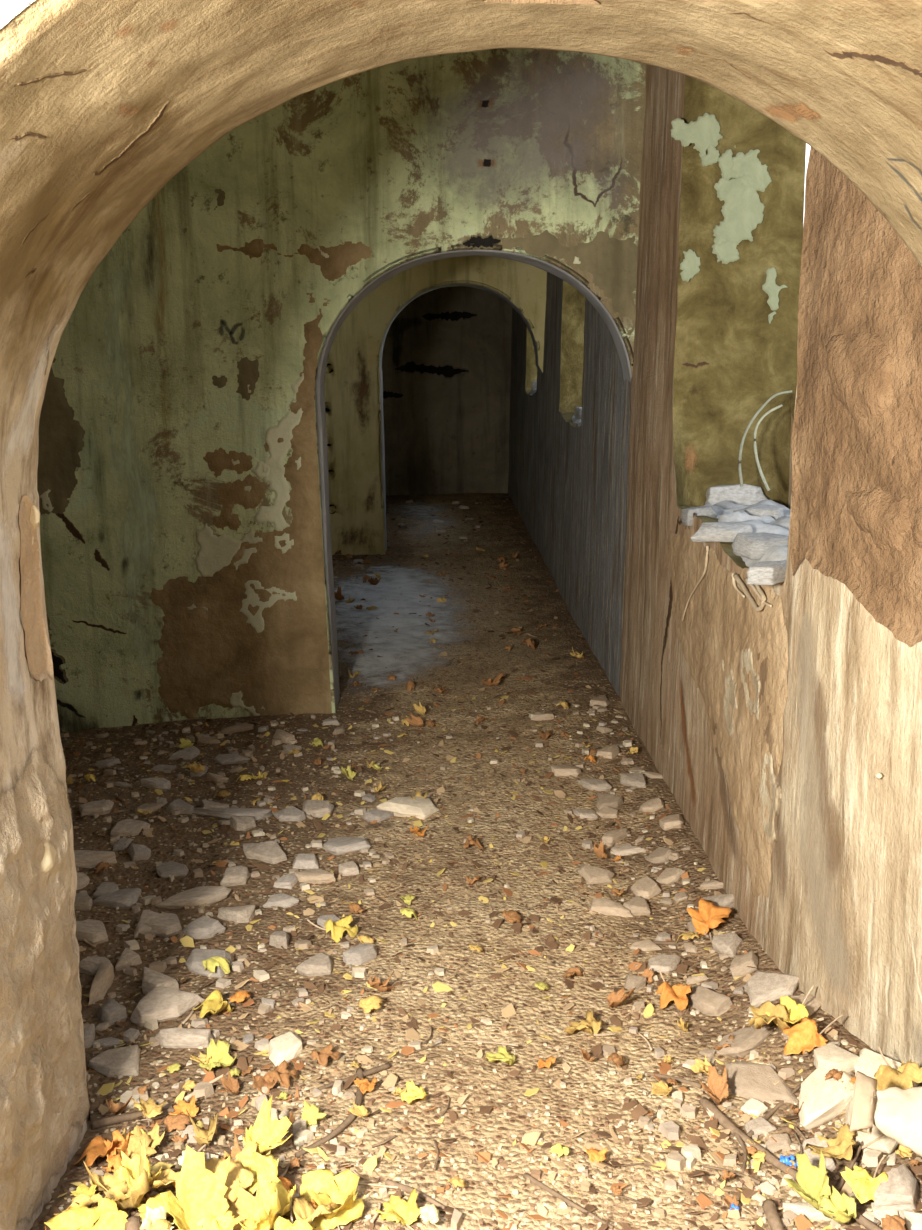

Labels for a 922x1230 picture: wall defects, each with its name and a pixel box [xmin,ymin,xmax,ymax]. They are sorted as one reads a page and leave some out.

peeling [216,239,372,281]
crack [563,128,623,207]
peeling [671,113,772,282]
spalling [762,147,922,647]
peeling [18,357,85,682]
peeling [151,293,332,720]
crack [46,609,127,718]